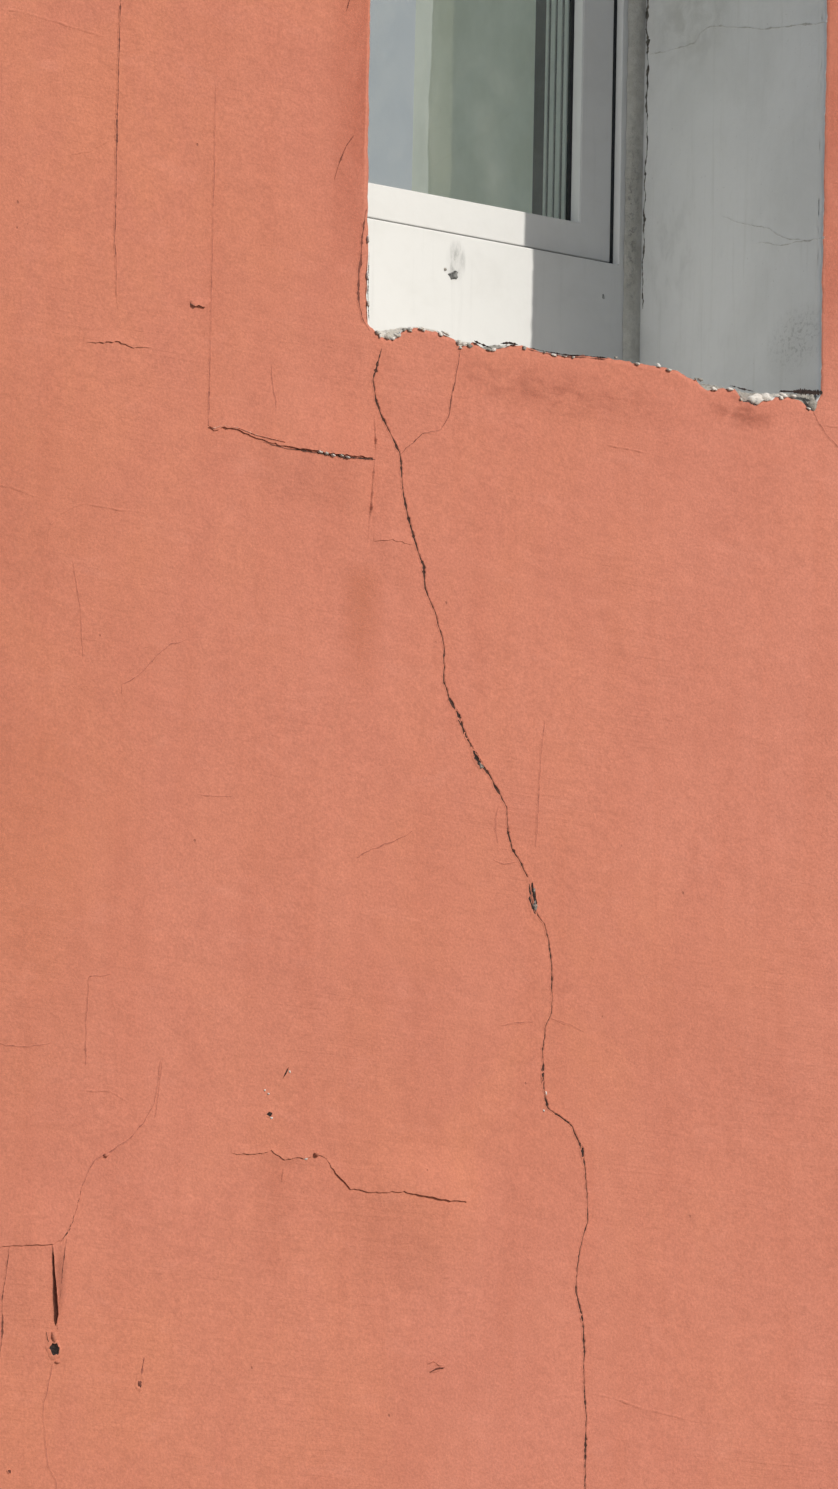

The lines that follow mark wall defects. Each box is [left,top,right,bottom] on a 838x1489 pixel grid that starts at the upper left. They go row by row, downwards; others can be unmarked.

spalling [366,265,618,359]
spalling [694,378,823,411]
crack [355,209,589,1489]
crack [0,1247,10,1364]
crack [42,1060,163,1489]